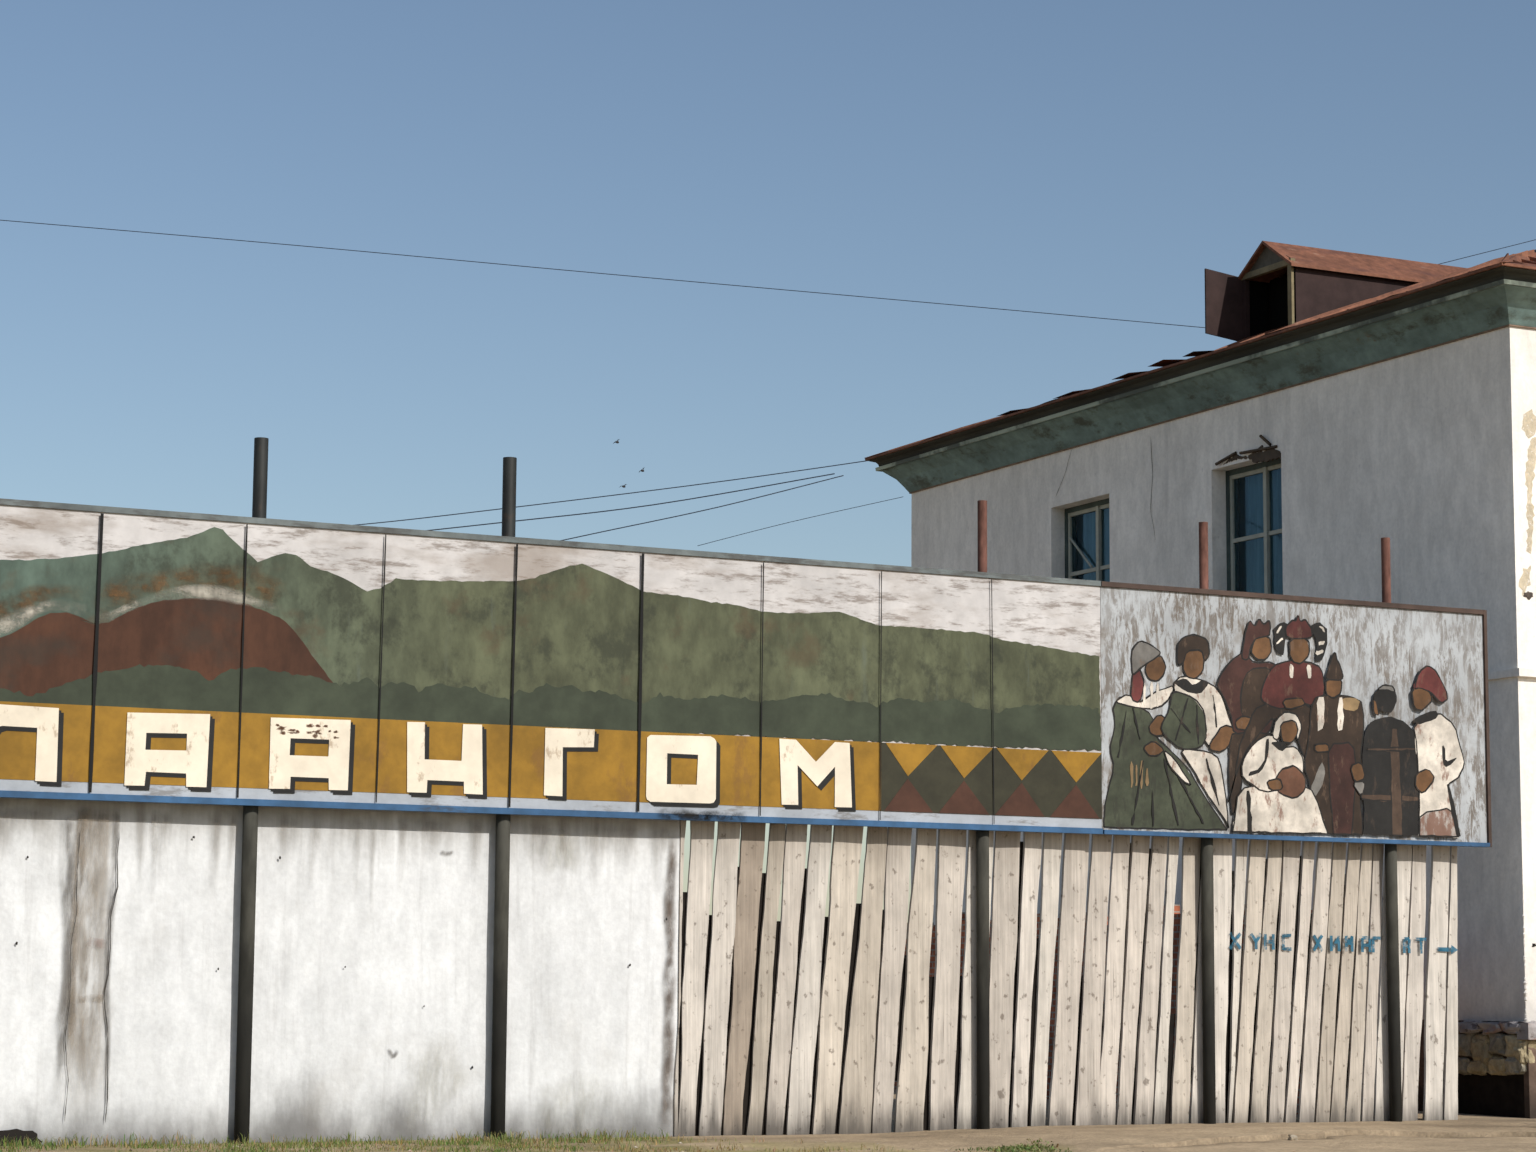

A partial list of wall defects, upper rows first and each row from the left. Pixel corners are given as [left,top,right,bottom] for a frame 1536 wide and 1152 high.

peeling [1519,409,1536,600]
water stain [61,813,109,1060]